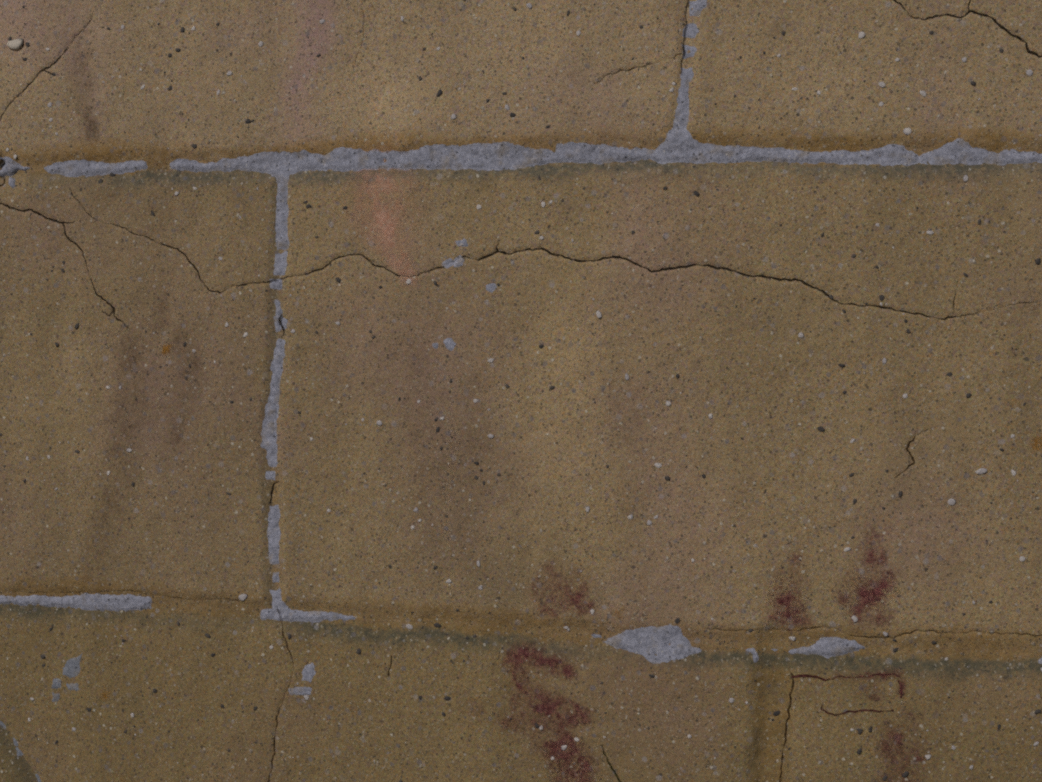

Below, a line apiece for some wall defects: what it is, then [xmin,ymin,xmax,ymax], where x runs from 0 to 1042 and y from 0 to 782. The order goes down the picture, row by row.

crack [0,21,90,120]
crack [674,2,688,74]
crack [894,0,1042,57]
crack [0,156,970,328]
crack [895,437,915,478]
crack [268,686,289,782]
rust [506,647,590,774]
crack [779,673,794,782]